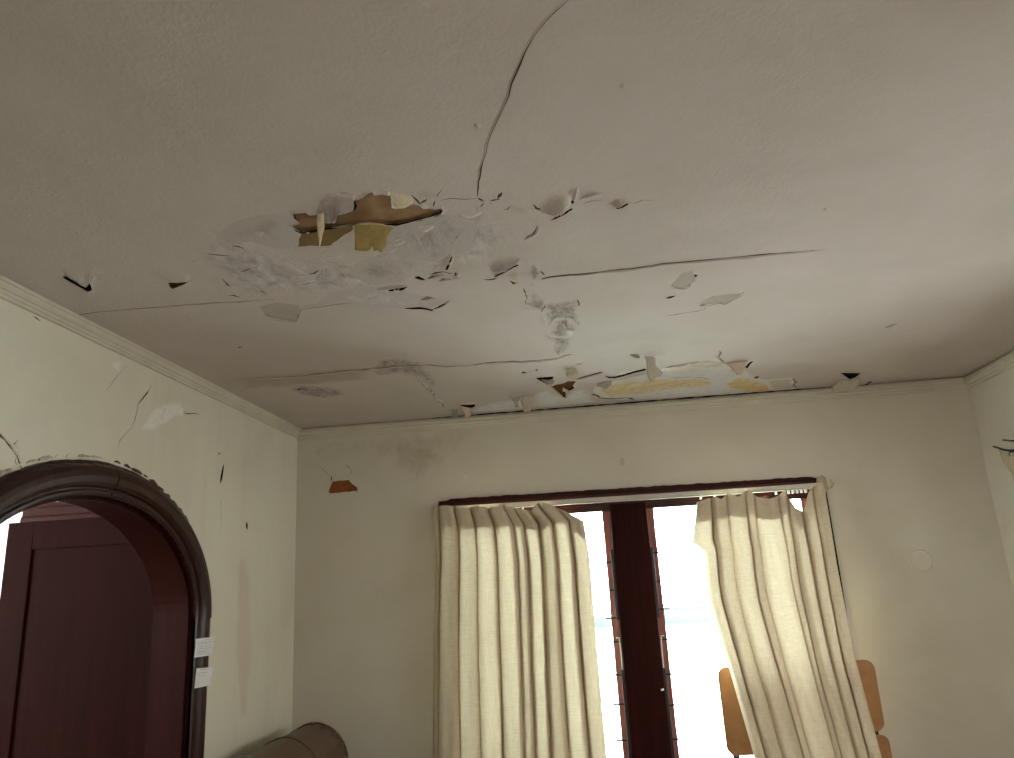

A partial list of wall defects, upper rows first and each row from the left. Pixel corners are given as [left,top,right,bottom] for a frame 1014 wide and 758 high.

crack [443,0,567,240]
leakage [169,168,541,309]
peeling [289,189,447,253]
crack [543,250,824,281]
crack [78,299,274,316]
crack [230,354,607,381]
peeling [451,262,800,419]
peeling [831,373,872,393]
crack [118,385,153,446]
flaking render [321,465,359,496]